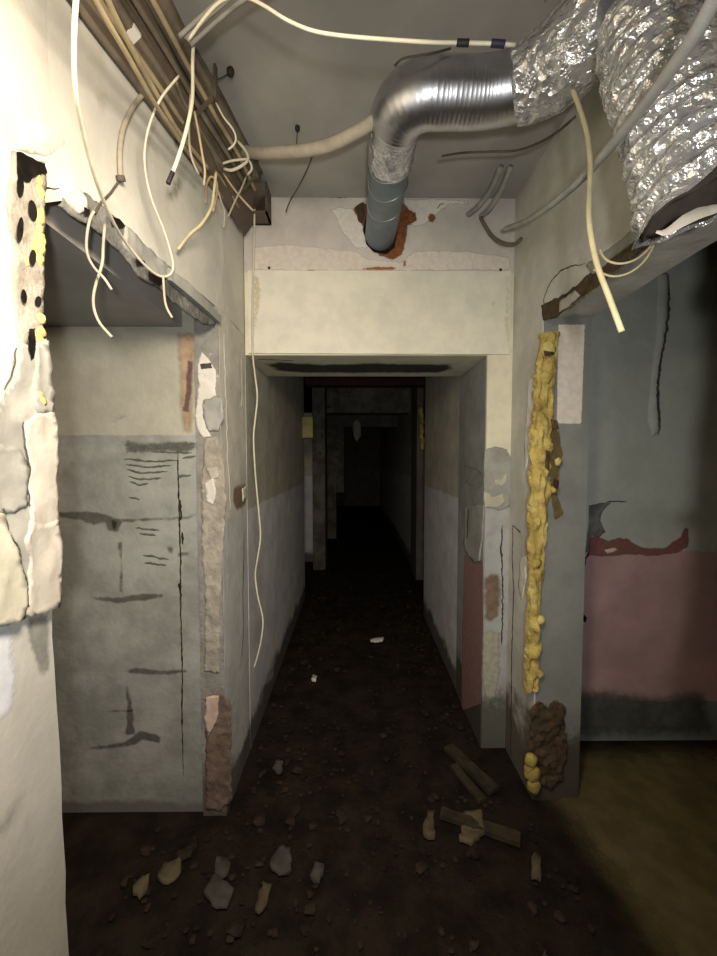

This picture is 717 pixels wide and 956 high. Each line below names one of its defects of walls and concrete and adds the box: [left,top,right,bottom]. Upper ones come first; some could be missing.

flaking render [58,182,222,326]
peeling [254,207,510,271]
corrosion [354,202,416,270]
peeling [403,199,468,226]
peeling [0,151,63,718]
crack [176,442,184,776]
peeling [461,446,511,710]
peeling [585,501,689,565]
flaking render [204,693,233,811]